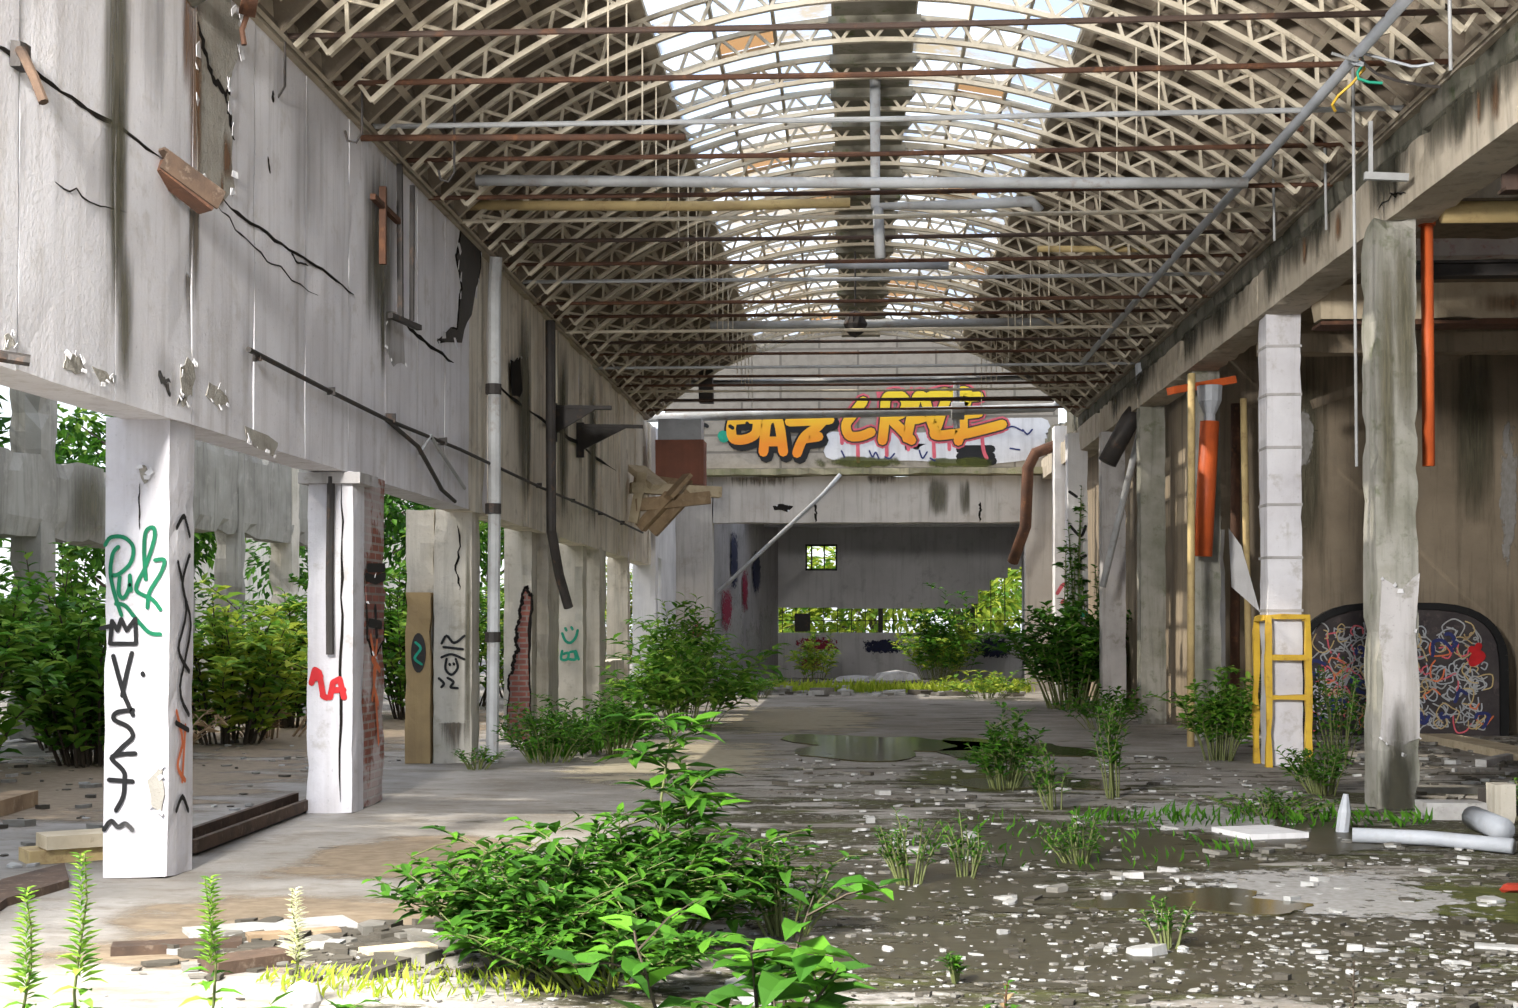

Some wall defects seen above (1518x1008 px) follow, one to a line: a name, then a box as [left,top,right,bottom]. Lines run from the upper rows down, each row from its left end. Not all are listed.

spalling [195,0,245,206]
leakage [1423,46,1518,143]
leakage [106,0,131,376]
leakage [1369,145,1406,201]
spalling [437,231,482,349]
spalling [63,349,117,387]
spalling [177,357,230,410]
spalling [365,574,389,659]
flaking render [507,585,534,740]
leakage [762,719,1518,1003]